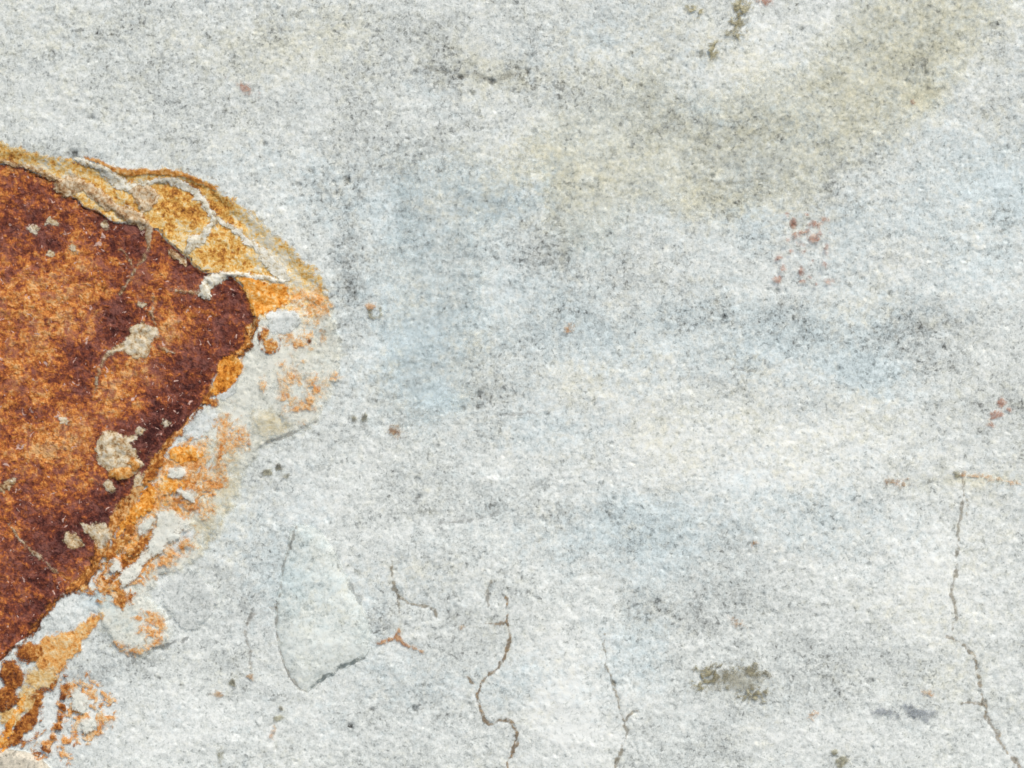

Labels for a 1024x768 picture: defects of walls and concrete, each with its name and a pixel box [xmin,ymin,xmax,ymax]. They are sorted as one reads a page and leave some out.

peeling [71,688,97,733]
corrosion [0,277,340,765]
spalling [0,141,342,660]
crack [468,596,519,768]